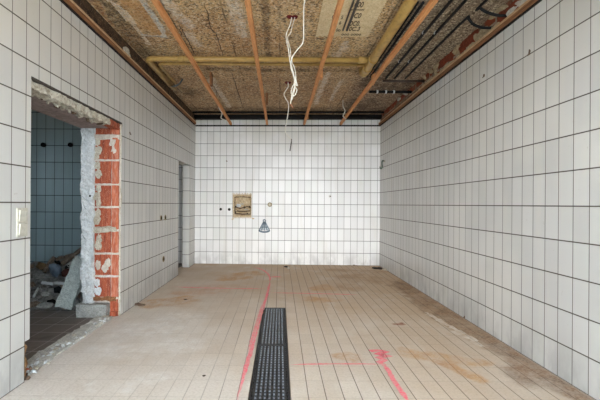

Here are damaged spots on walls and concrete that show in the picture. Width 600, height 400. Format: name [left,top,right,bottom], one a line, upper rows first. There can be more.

flaking render [31,80,120,130]
flaking render [93,138,102,225]
spalling [24,316,112,380]
water stain [382,279,593,400]